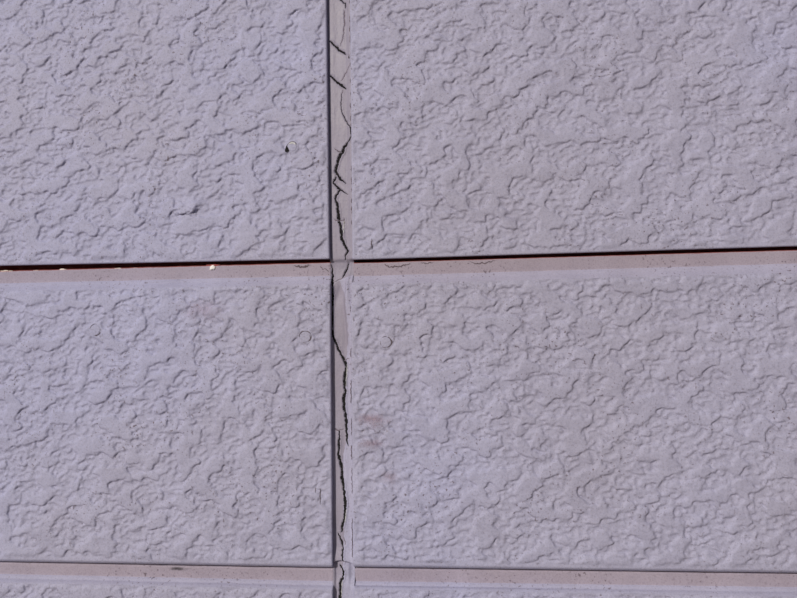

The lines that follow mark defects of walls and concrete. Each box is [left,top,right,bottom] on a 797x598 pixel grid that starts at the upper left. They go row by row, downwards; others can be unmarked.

crack [329,0,353,598]